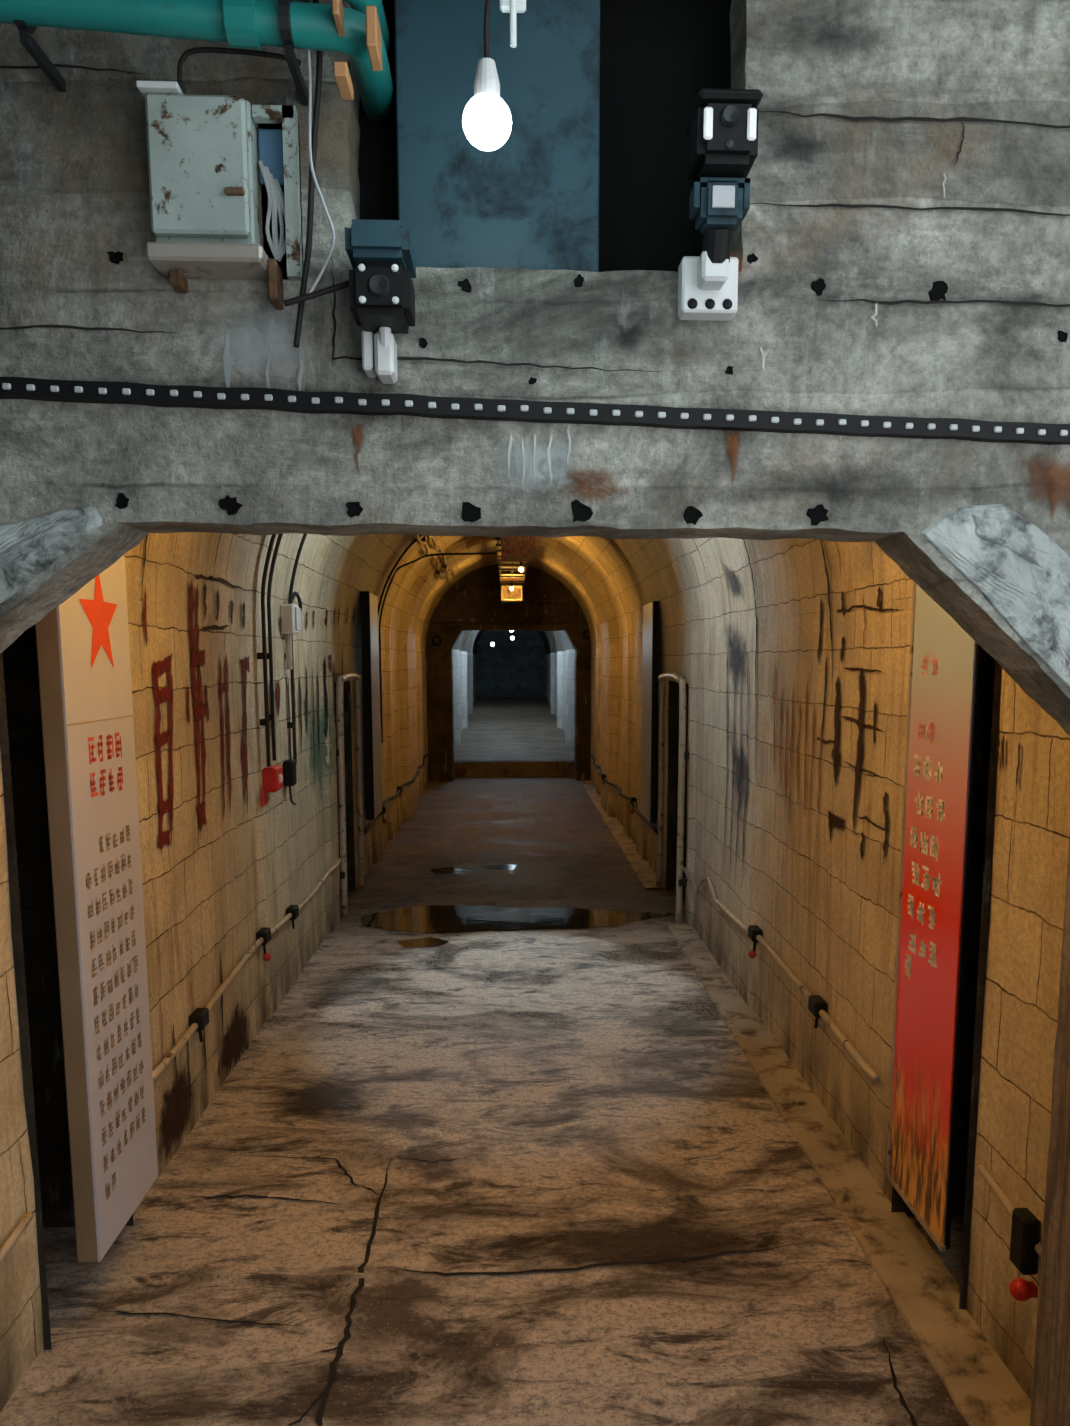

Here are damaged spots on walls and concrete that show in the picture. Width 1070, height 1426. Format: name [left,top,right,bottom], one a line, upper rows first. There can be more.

leakage [724,540,755,616]
leakage [723,629,749,876]
crack [102,1311,296,1326]
crack [188,1154,804,1426]
crack [883,1338,917,1426]